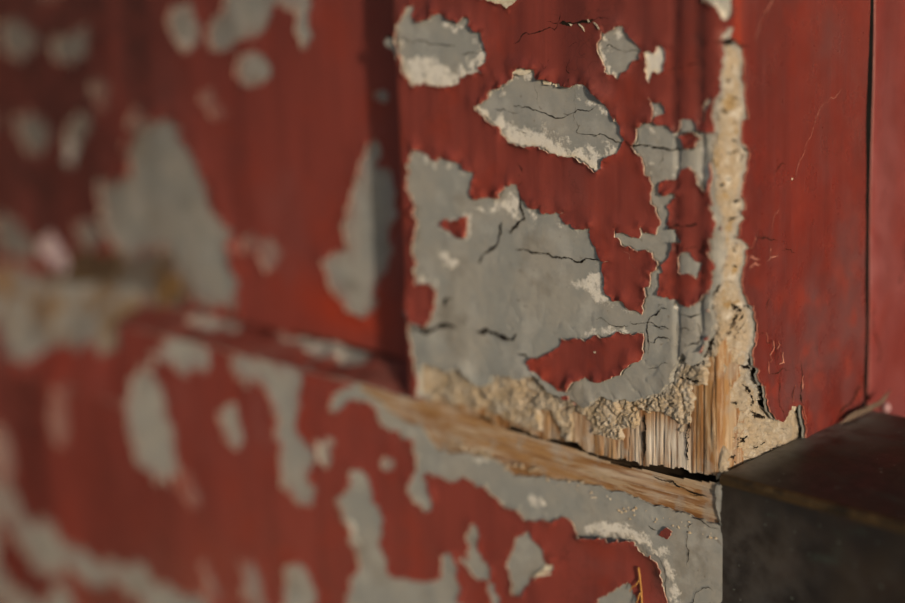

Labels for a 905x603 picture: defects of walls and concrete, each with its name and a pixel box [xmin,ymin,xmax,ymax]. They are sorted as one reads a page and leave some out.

peeling [169,0,312,53]
peeling [236,51,271,87]
peeling [0,112,282,365]
peeling [324,0,800,603]
peeling [279,333,372,366]
peeling [126,336,211,508]
peeling [219,403,244,450]
peeling [233,354,336,506]
crack [642,415,708,498]
crack [685,389,716,471]
peeling [0,425,207,603]
peeling [285,562,318,603]